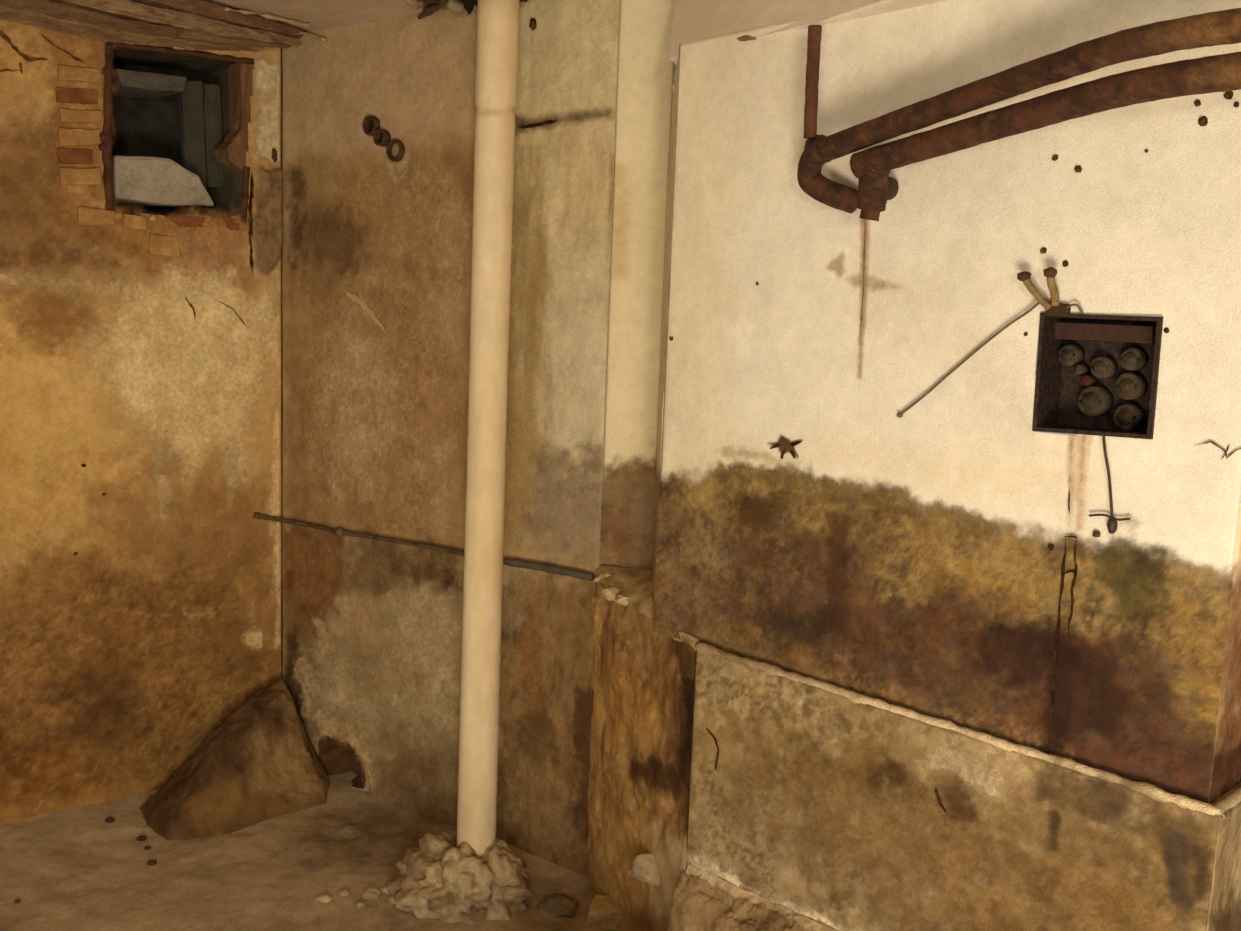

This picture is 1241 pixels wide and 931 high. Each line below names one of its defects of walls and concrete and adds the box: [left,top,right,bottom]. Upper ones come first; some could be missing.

crack [0,31,86,73]
peeling [0,0,327,647]
rust [859,219,885,372]
damp [0,132,474,826]
damp [496,162,1241,931]
spalling [296,564,464,792]
peeling [592,597,646,827]